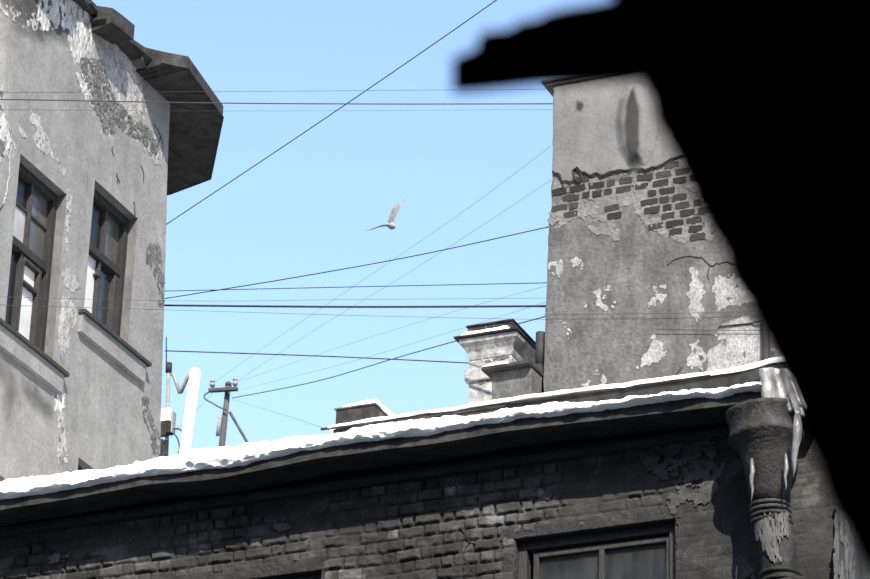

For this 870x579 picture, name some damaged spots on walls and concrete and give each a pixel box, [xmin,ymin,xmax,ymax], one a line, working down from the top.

spalling [0,0,164,176]
water stain [629,143,640,168]
peeling [65,189,73,251]
flaking render [547,160,714,244]
peeling [686,267,762,371]
peeling [636,334,667,369]
peeling [754,509,789,564]
peeling [833,515,855,579]